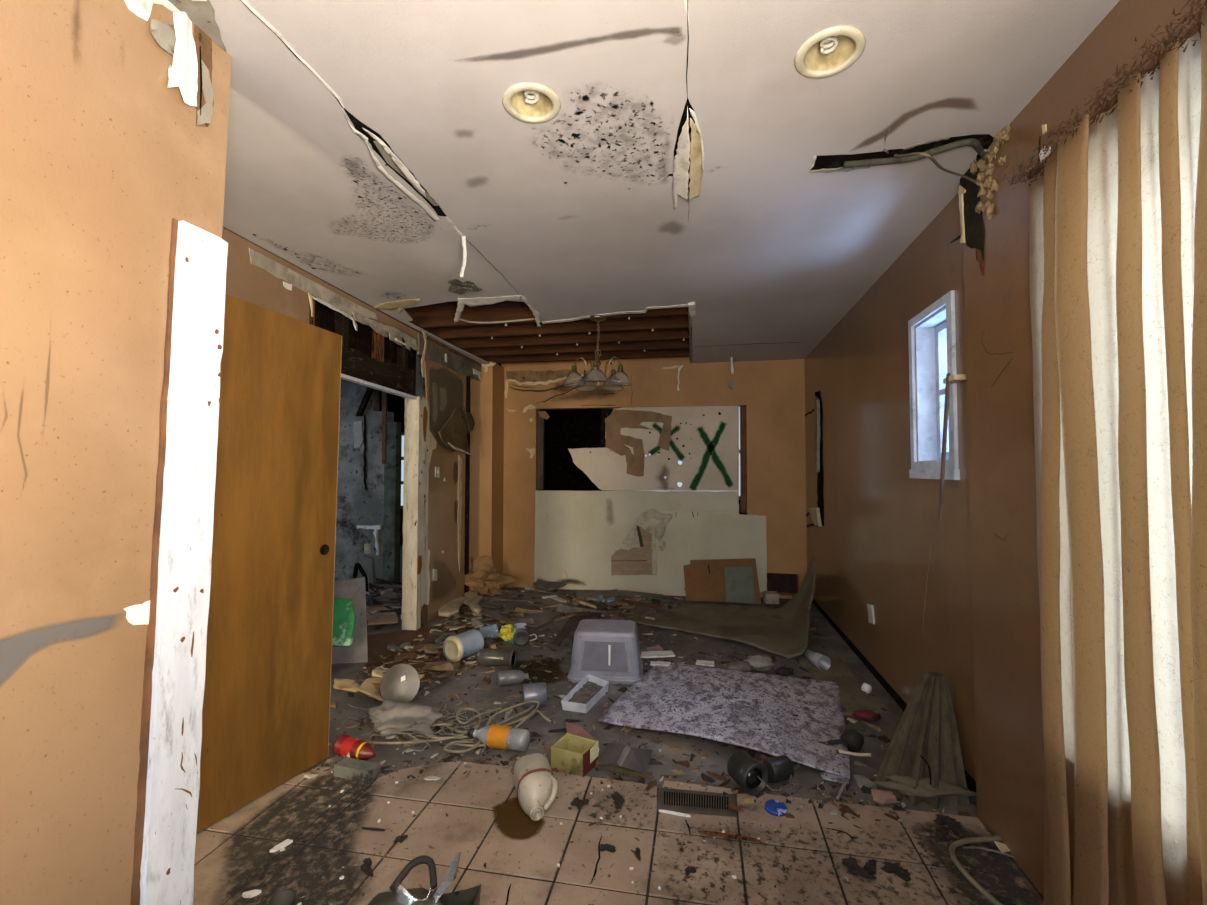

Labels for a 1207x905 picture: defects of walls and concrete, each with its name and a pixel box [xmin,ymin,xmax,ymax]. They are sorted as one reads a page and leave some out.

flaking render [168,0,227,53]
crack [682,0,690,98]
crack [240,0,519,294]
leakage [542,87,673,189]
leakage [339,159,430,242]
crack [809,134,994,278]
spalling [542,302,696,369]
flaking render [482,363,584,422]